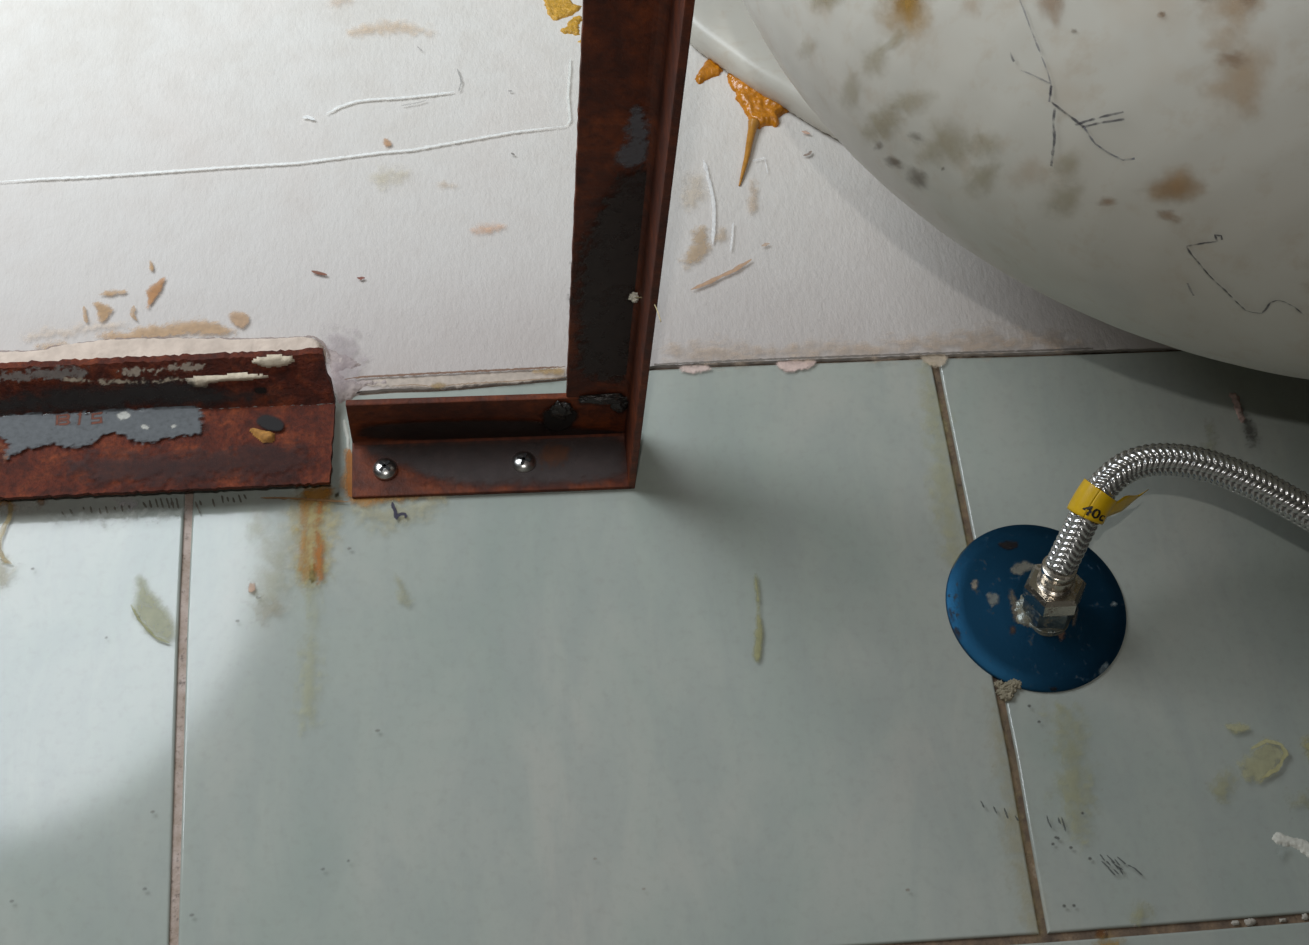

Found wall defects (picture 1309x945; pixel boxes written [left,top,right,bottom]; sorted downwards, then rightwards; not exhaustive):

corrosion [261,449,419,580]